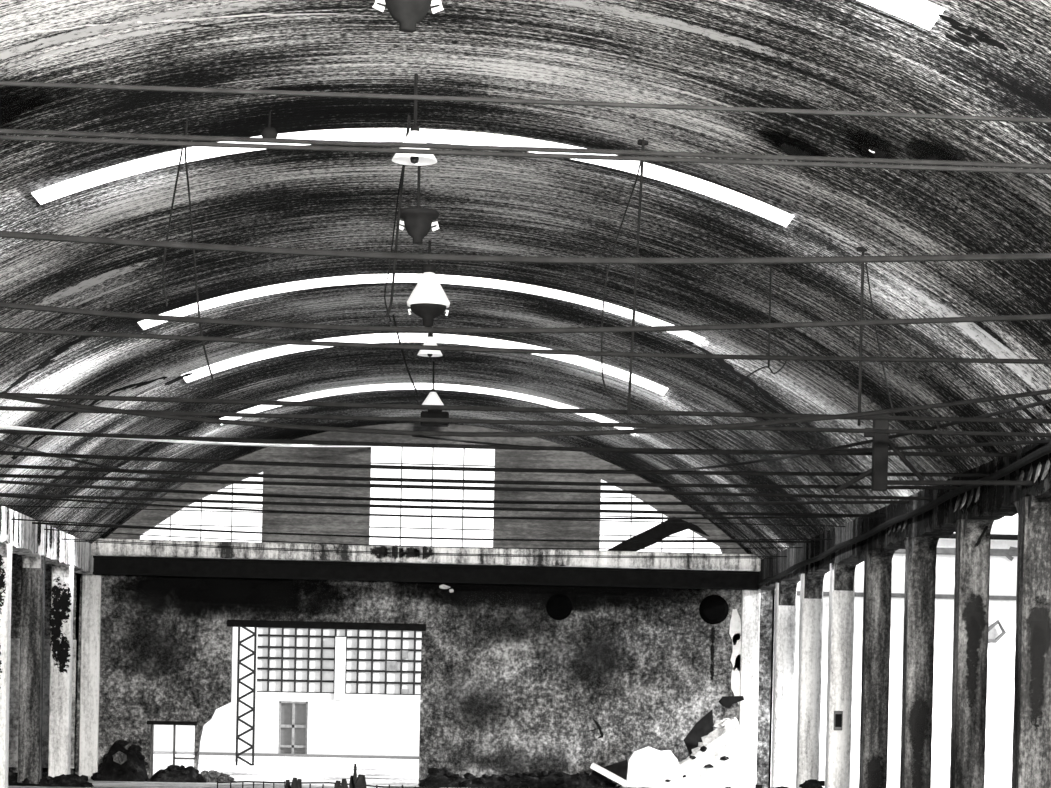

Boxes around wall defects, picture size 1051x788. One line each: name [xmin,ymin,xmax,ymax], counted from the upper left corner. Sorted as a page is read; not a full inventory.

leakage [761,130,826,162]
leakage [848,131,894,159]
leakage [908,140,960,173]